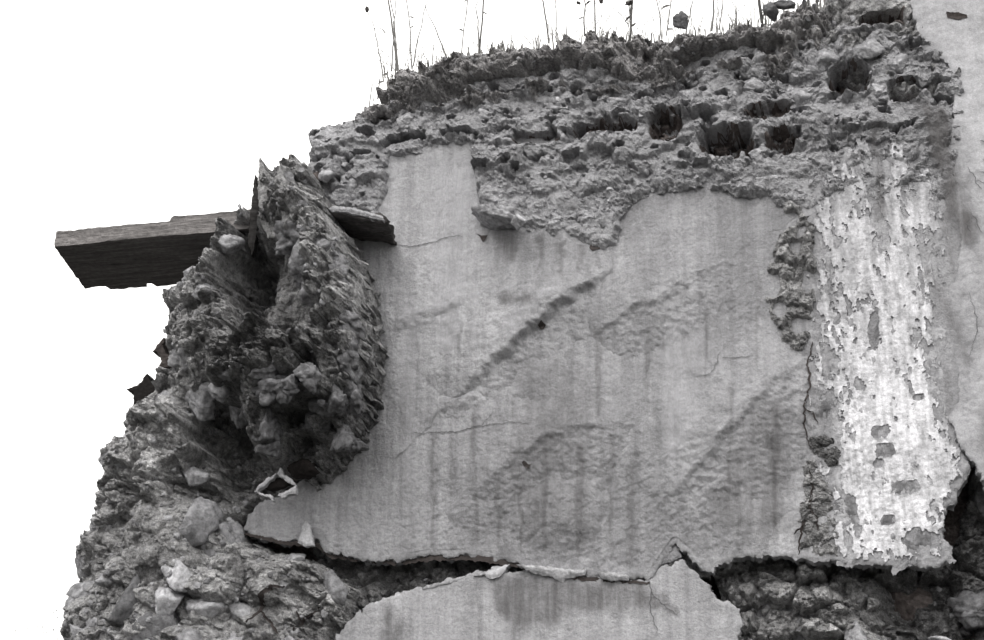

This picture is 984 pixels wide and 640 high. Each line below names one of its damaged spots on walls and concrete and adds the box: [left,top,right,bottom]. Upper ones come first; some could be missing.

hole [861,6,905,26]
spalling [946,12,967,20]
spalling [829,58,869,95]
hole [572,105,682,141]
hole [699,101,799,159]
peeling [661,132,984,640]
crack [405,413,525,435]
crack [244,521,682,634]